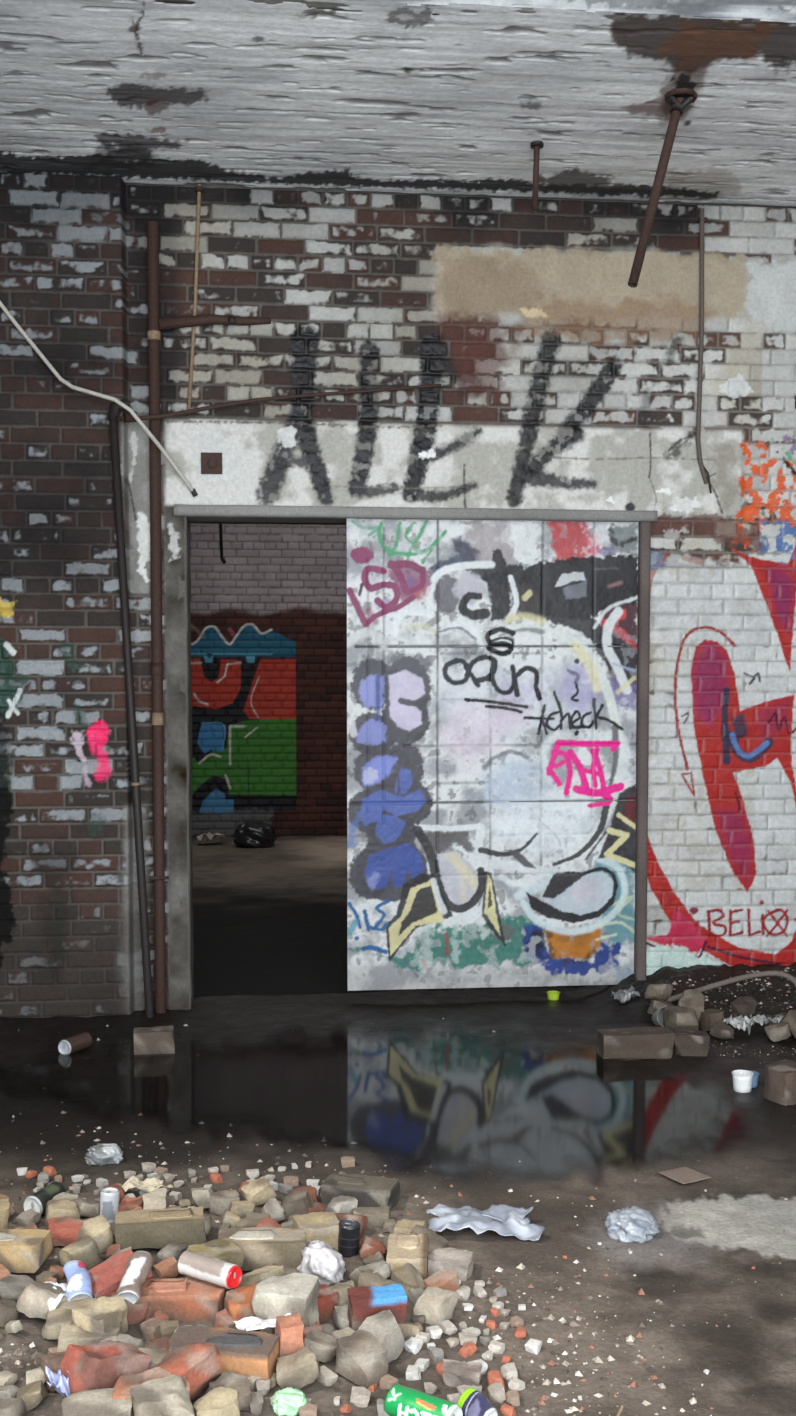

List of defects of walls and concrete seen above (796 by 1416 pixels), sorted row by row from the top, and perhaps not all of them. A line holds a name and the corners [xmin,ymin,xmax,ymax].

corrosion [606,12,796,128]
corrosion [648,161,747,203]
peeling [717,372,755,400]